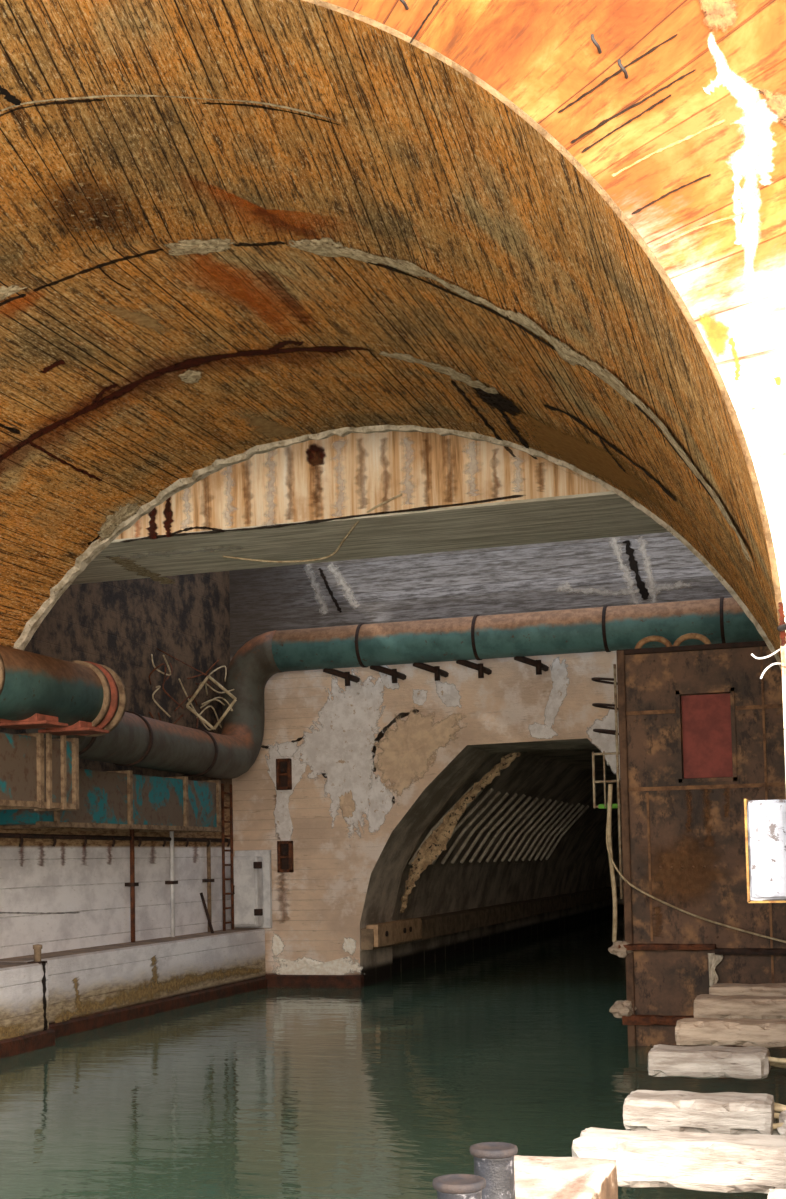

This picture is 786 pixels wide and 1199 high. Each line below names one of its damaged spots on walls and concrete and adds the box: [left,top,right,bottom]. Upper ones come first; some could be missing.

crack [0,85,339,125]
crack [34,249,163,291]
corrosion [700,314,741,381]
corrosion [146,489,190,539]
crack [0,340,373,481]
corrosion [306,441,364,517]
crack [451,380,537,459]
crack [544,404,677,502]
peeling [261,665,461,841]
leakage [0,1023,27,1040]